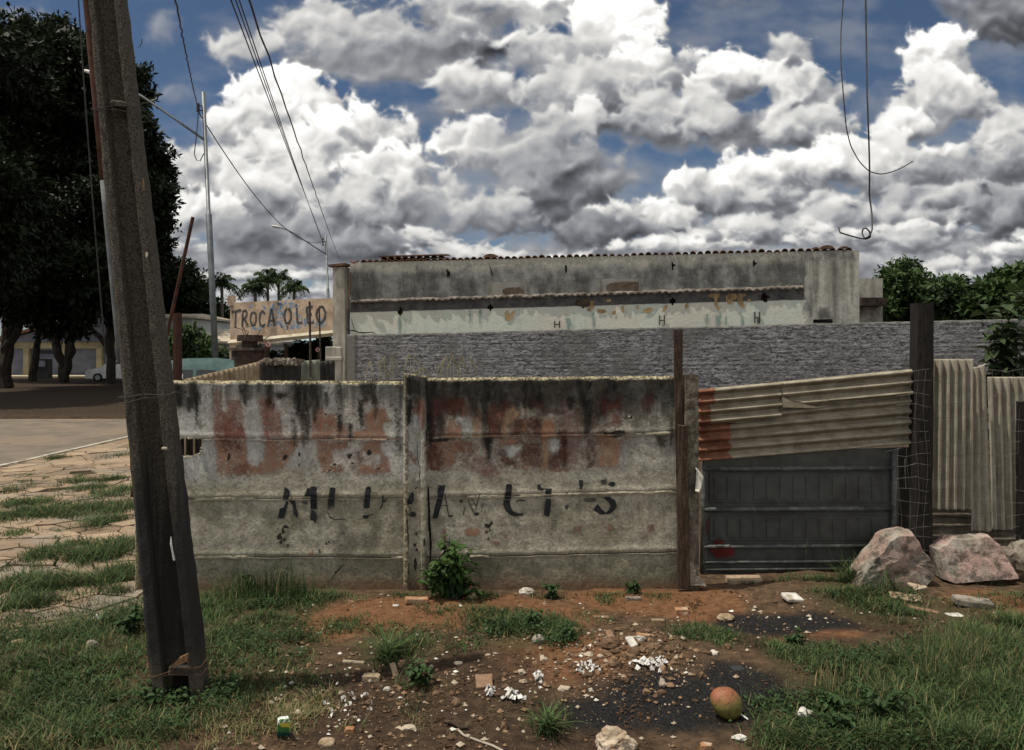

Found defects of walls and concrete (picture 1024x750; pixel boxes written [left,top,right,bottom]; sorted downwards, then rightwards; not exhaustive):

leakage [174,381,199,426]
peeling [180,384,301,475]
leakage [239,381,378,447]
peeling [312,383,389,474]
peeling [410,398,581,475]
leakage [394,376,627,462]
peeling [596,396,632,438]